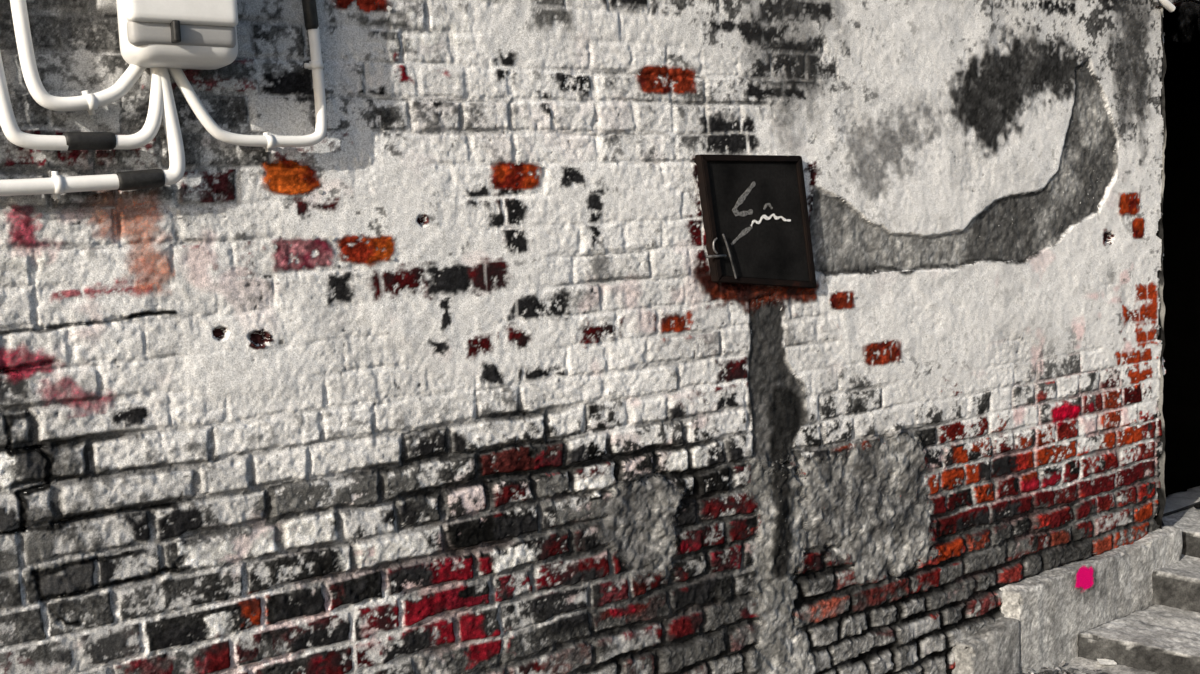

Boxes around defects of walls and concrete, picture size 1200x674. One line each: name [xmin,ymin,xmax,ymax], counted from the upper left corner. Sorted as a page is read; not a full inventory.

peeling [637,64,698,94]
damp [848,107,933,198]
crack [0,310,176,334]
crack [0,411,85,534]
crack [134,502,178,510]
crack [31,551,191,626]